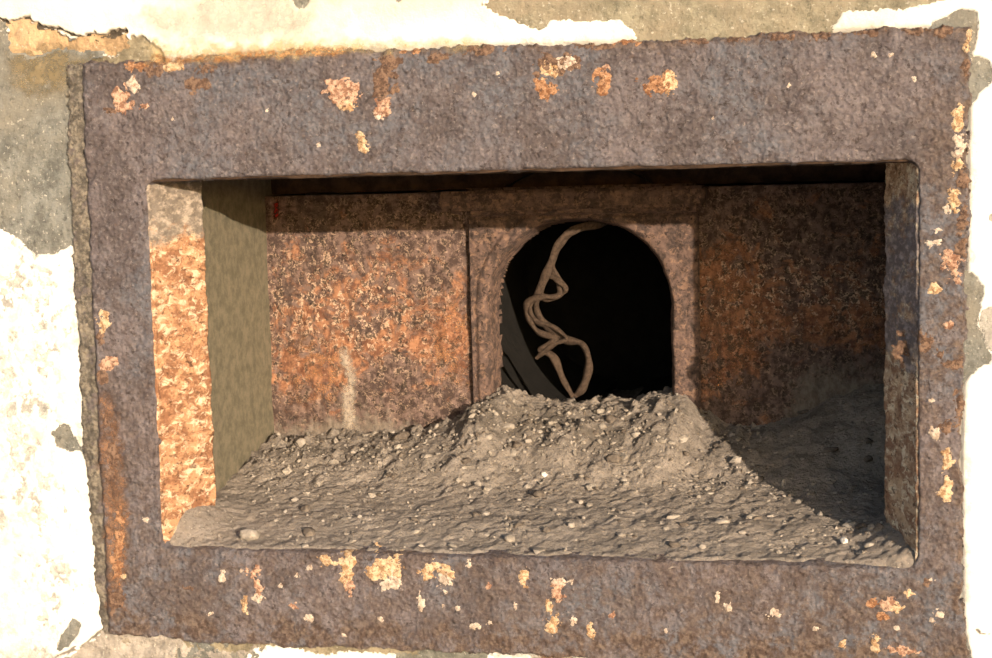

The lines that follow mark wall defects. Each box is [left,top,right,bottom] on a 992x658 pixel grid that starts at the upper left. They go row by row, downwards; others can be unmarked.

rust [103,39,364,116]
rust [320,41,509,120]
rust [532,39,642,102]
peeling [482,0,942,42]
peeling [931,9,992,108]
rust [925,103,972,294]
peeling [0,17,276,658]
peeling [962,271,992,384]
rust [928,384,965,504]
rust [317,542,405,597]
peeling [715,591,732,612]
peeling [299,633,577,658]